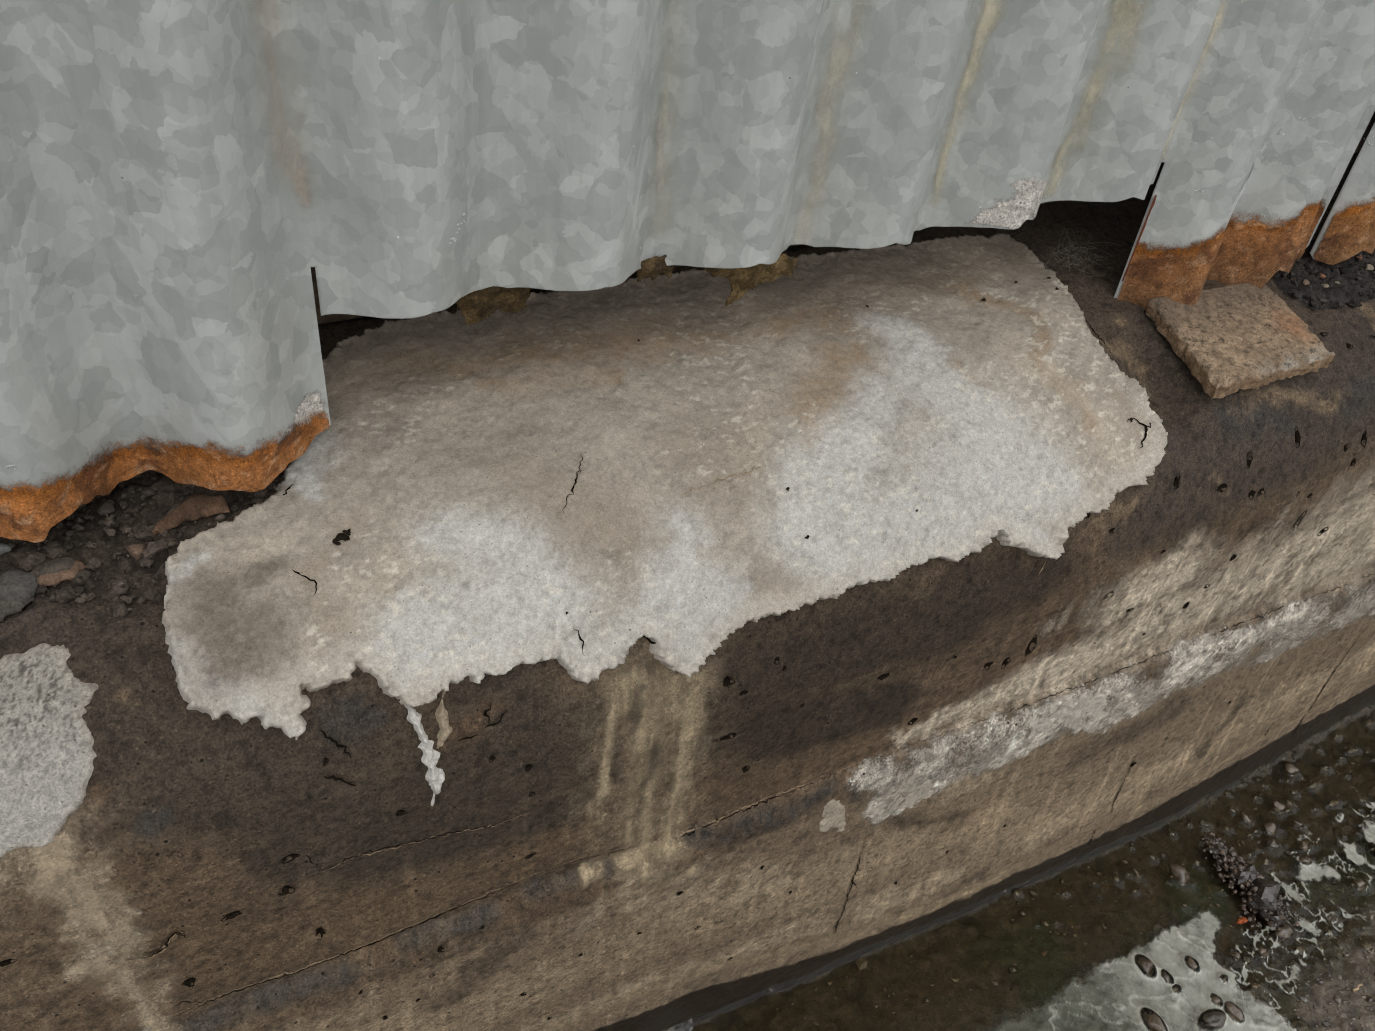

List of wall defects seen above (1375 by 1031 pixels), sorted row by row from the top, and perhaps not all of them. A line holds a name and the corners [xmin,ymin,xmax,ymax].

rust [1117,195,1375,310]
peeling [0,643,98,858]
rust [0,411,330,543]
crack [562,453,583,512]
water stain [579,664,705,885]
peeling [162,233,1168,806]
crack [166,649,1172,1020]
water stain [850,578,1375,824]
crack [1211,573,1375,636]
crack [112,932,186,963]